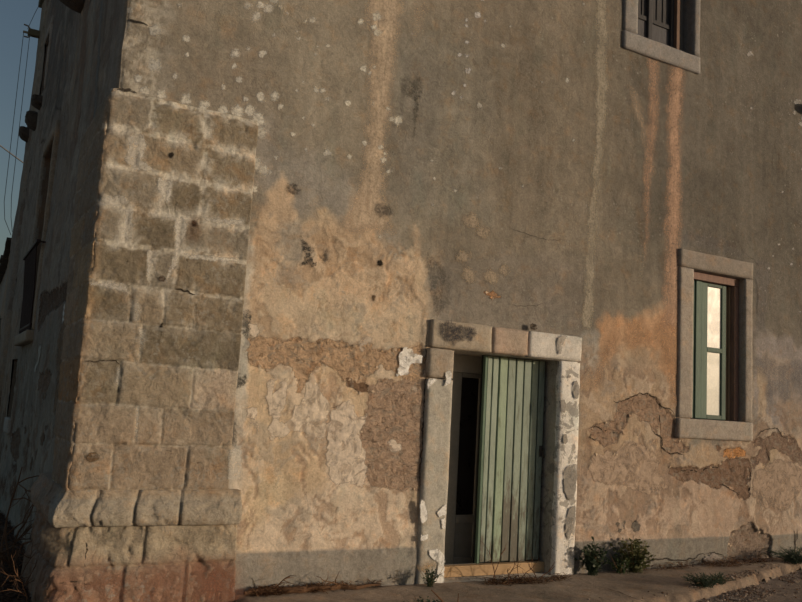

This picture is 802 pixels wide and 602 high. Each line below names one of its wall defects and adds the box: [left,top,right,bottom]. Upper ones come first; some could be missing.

leakage [343,0,401,230]
rust [664,67,683,327]
spalling [38,282,67,331]
leakage [440,321,477,344]
spalling [246,324,452,492]
peeling [588,393,802,510]
peeling [420,500,446,529]
peeling [429,549,445,583]
peeling [560,464,577,540]
spalling [726,522,773,561]